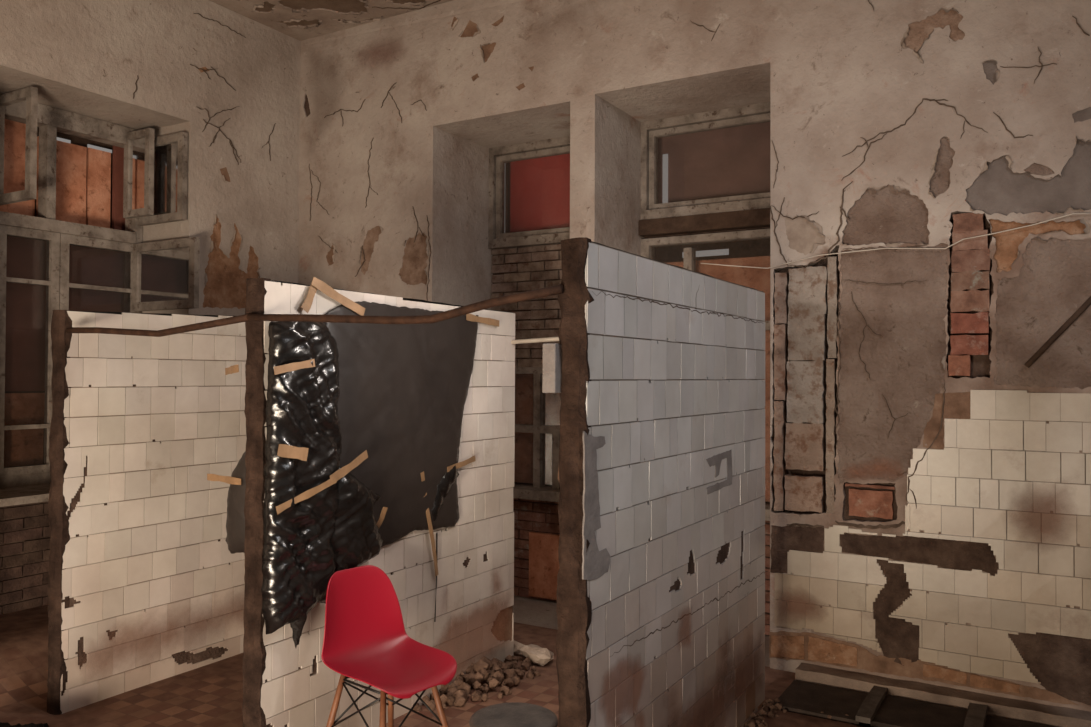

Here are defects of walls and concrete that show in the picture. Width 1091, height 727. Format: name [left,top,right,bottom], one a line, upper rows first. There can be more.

peeling [901,7,965,64]
crack [190,64,276,165]
crack [324,83,427,126]
crack [365,139,378,208]
crack [770,98,1033,268]
peeling [399,232,429,286]
crack [835,280,927,445]
spalling [773,137,1091,521]
spalling [203,215,287,727]
peeling [770,525,824,573]
peeling [172,647,228,664]
flaking render [769,533,1091,705]